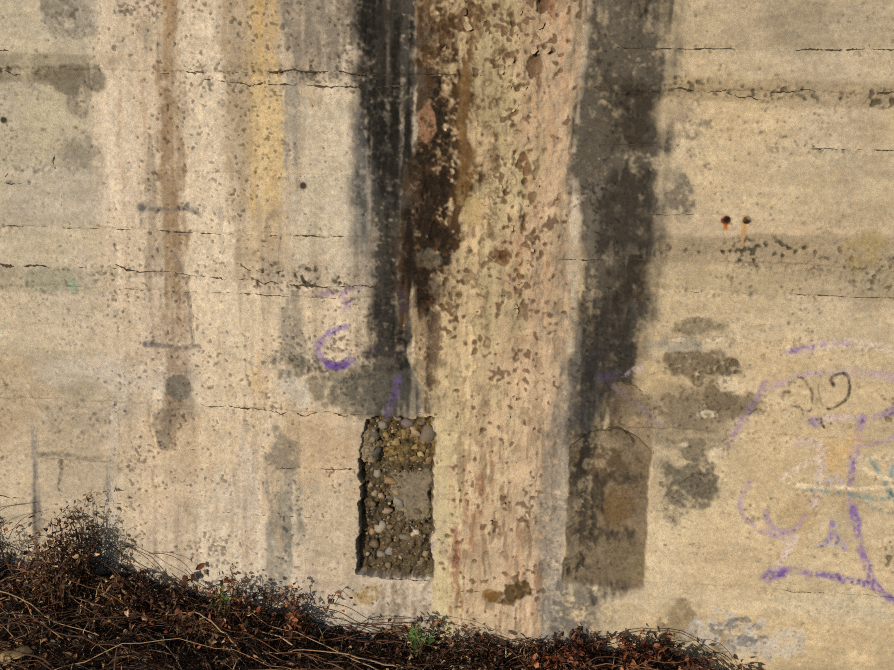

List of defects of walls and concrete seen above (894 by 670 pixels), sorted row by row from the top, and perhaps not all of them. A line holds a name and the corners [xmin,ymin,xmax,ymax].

damp [22,0,166,452]
damp [172,0,469,627]
spalling [355,415,438,581]
damp [467,73,490,198]
damp [529,0,771,663]
corrosion [720,215,752,249]